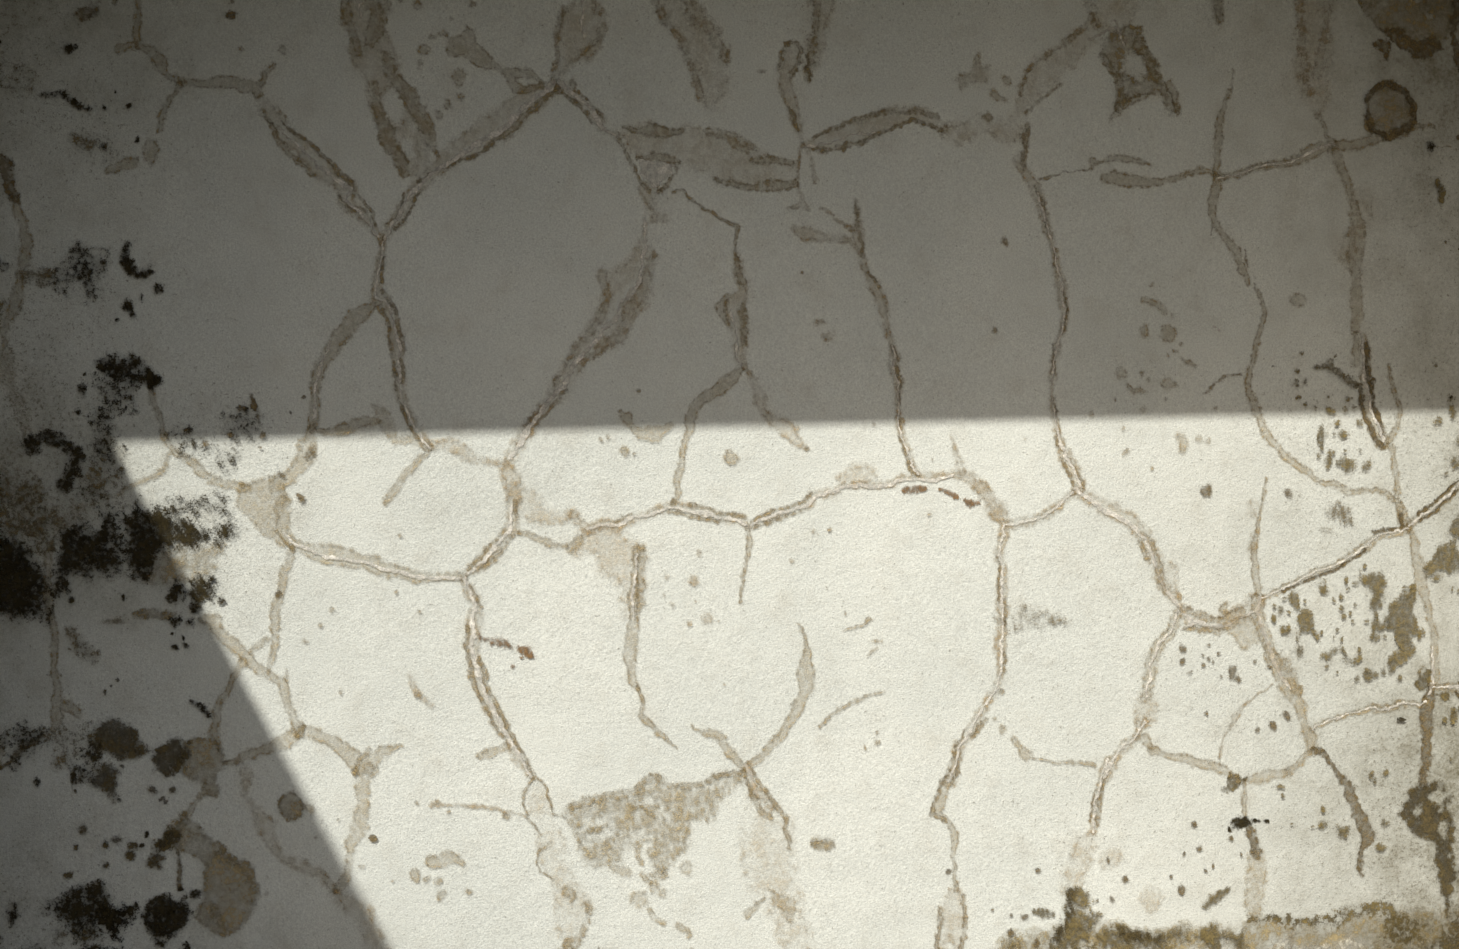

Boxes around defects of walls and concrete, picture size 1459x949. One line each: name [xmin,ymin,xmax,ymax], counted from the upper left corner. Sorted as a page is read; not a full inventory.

crack [1450,1,1459,70]
crack [0,154,33,320]
mould [0,241,164,322]
crack [1083,89,1432,254]
crack [106,0,989,841]
mould [1294,351,1372,472]
crack [0,543,81,770]
leakage [0,351,238,662]
crack [931,124,1459,949]
mould [1271,518,1459,681]
mould [0,718,151,803]
leakage [21,831,201,949]